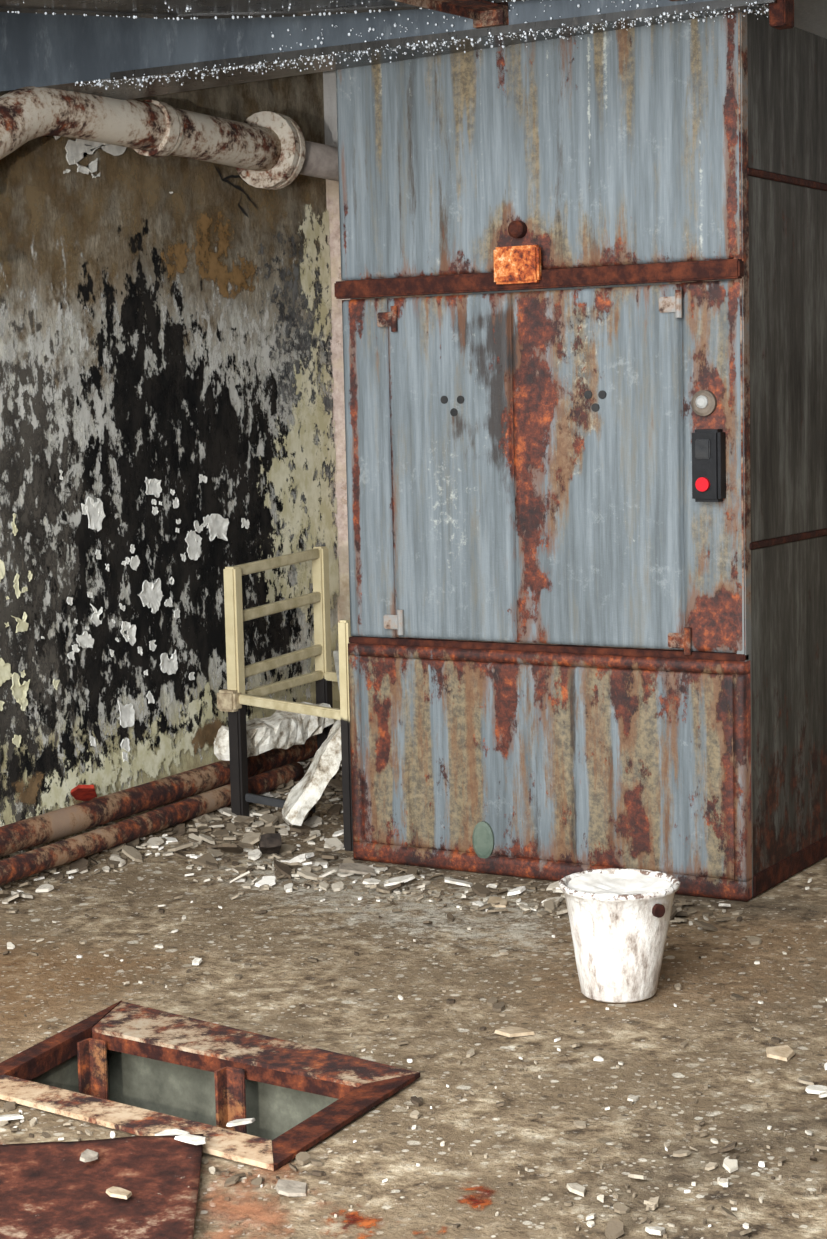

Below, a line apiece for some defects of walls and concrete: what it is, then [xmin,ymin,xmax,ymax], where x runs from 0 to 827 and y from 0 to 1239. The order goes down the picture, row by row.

water stain [238,78,322,144]
water stain [0,136,337,825]
rust [191,718,224,754]
rust [203,1179,284,1239]